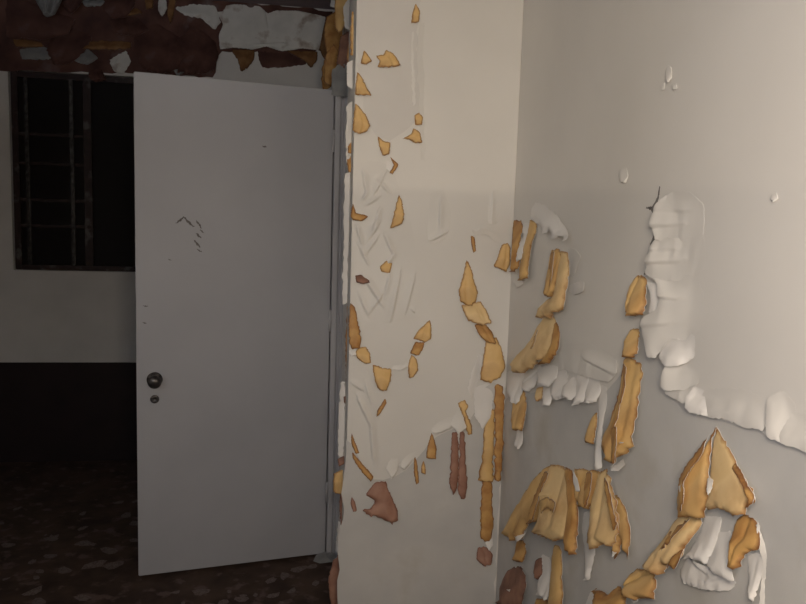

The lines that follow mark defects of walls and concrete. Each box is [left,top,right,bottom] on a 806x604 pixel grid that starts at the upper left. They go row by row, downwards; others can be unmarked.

peeling [0,0,432,416]
peeling [328,191,806,604]
crack [646,186,660,213]